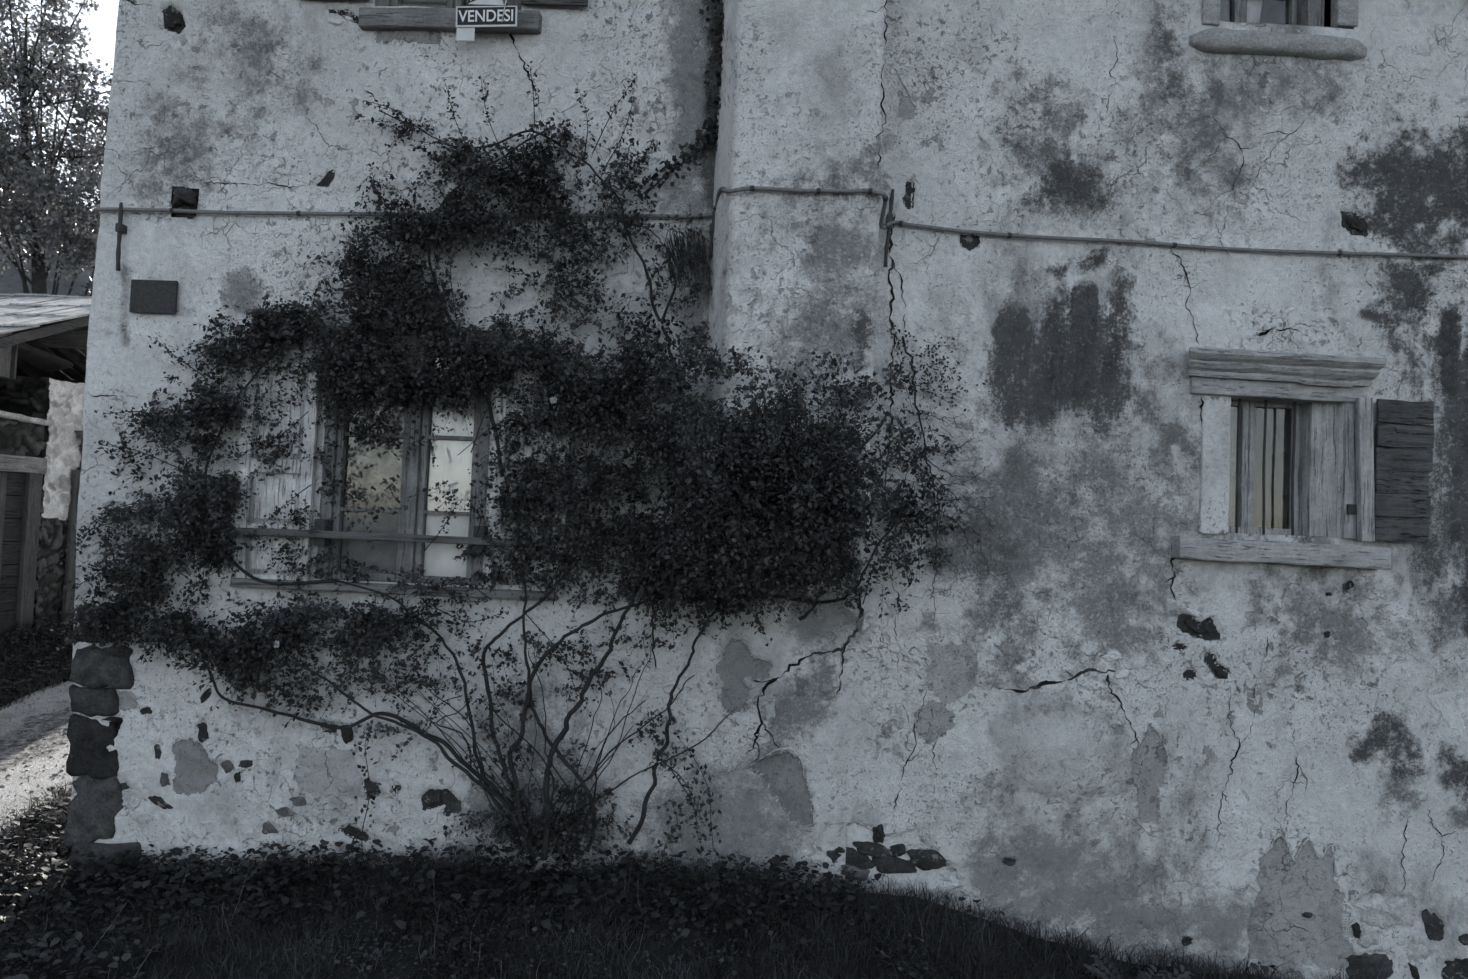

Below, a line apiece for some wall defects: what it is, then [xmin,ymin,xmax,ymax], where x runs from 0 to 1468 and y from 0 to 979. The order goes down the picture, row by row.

crack [866,0,888,173]
leakage [1015,82,1117,226]
leakage [1336,115,1468,652]
leakage [926,247,1214,688]
flaking render [120,722,253,811]
flaking render [709,633,773,715]
crack [746,593,901,761]
flaking render [748,747,961,892]
crack [998,650,1143,784]
spalling [1172,608,1230,680]
leakage [1350,713,1468,800]
flaking render [1248,828,1468,979]